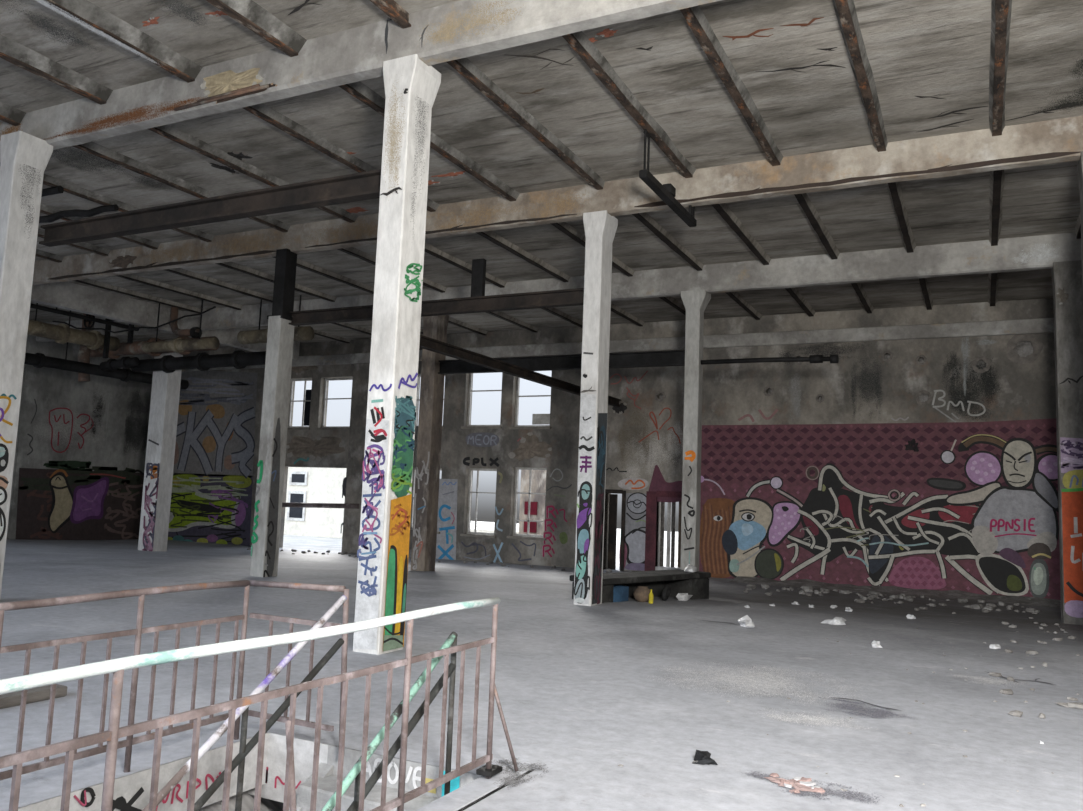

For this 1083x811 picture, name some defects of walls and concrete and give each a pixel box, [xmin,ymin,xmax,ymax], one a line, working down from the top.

crack [288,0,320,15]
rust [45,96,208,140]